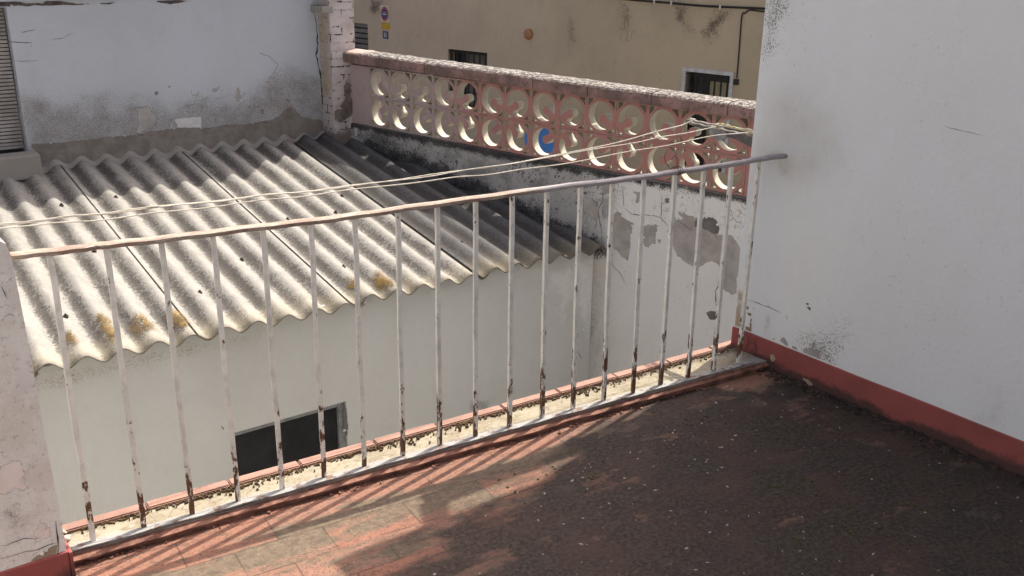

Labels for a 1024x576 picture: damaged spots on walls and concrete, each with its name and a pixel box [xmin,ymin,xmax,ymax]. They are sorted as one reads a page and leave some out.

water stain [9,13,332,151]
peeling [31,77,358,167]
water stain [351,0,855,344]
peeling [583,185,740,295]